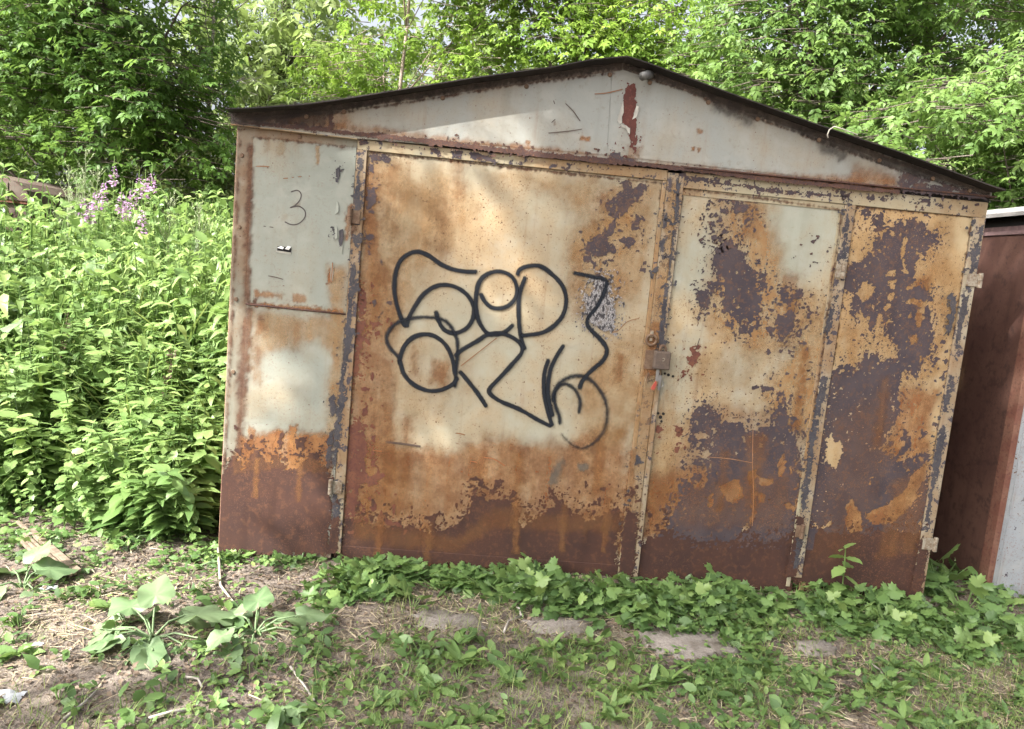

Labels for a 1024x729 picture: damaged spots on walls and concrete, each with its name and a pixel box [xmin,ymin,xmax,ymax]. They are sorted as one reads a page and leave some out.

peeling [418,144,523,168]
corrosion [219,111,971,599]
peeling [560,80,991,569]